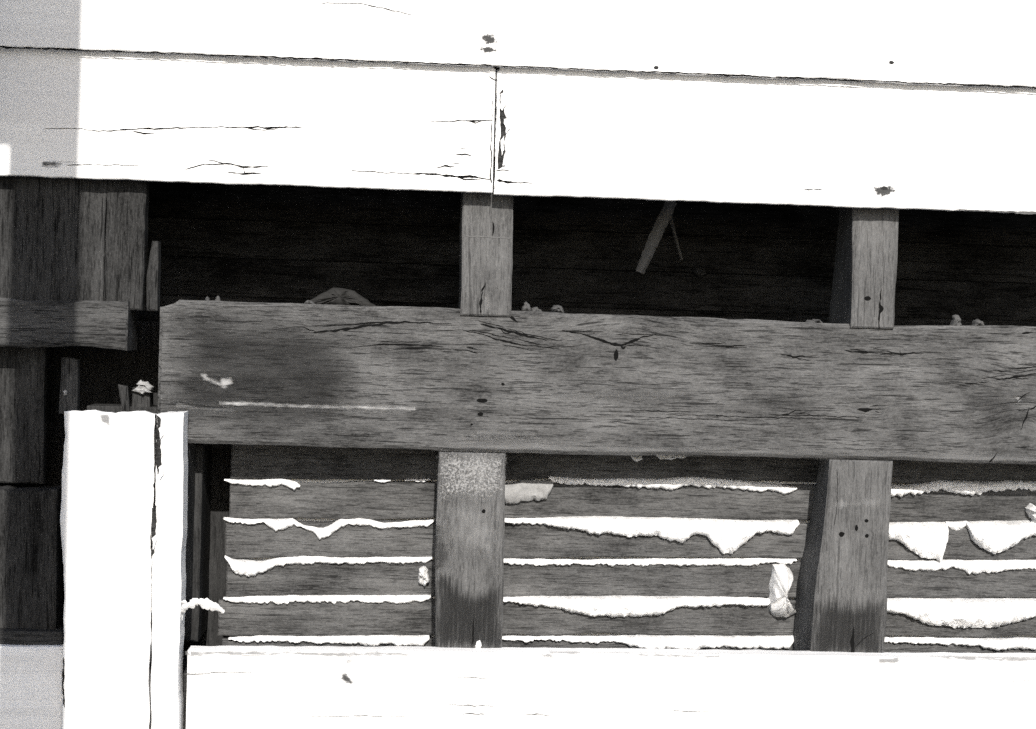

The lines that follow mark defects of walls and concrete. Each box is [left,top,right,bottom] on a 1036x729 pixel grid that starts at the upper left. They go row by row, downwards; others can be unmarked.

crack [305,315,667,353]
crack [957,364,1036,429]
crack [149,414,157,729]